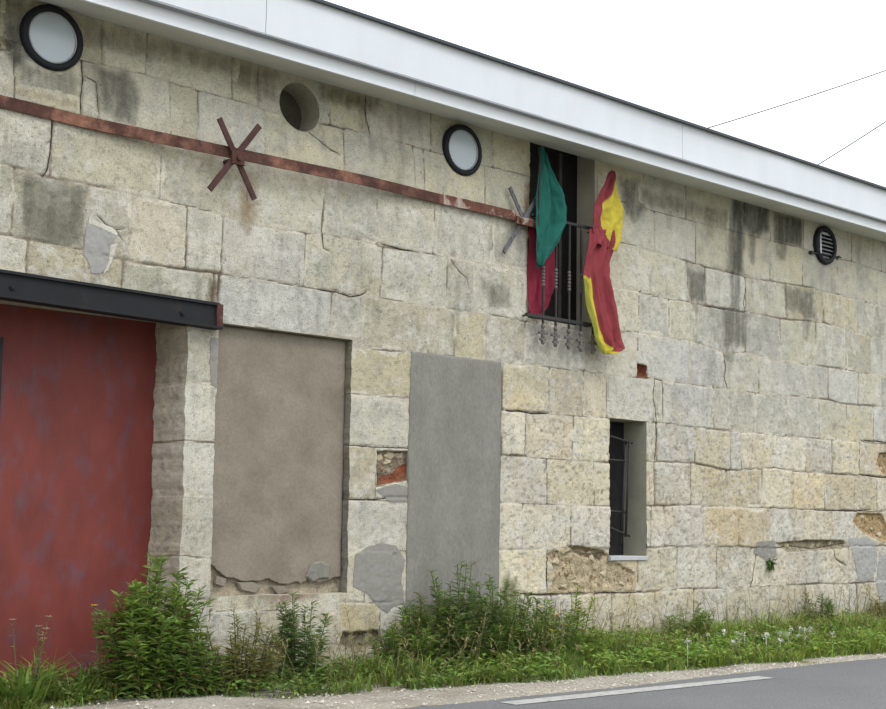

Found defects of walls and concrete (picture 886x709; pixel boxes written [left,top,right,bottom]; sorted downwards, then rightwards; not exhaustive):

water stain [731,200,802,272]
water stain [785,289,812,314]
spalling [376,450,408,487]
spalling [877,453,886,475]
spalling [853,512,886,543]
spalling [776,539,845,552]
spalling [547,545,635,595]